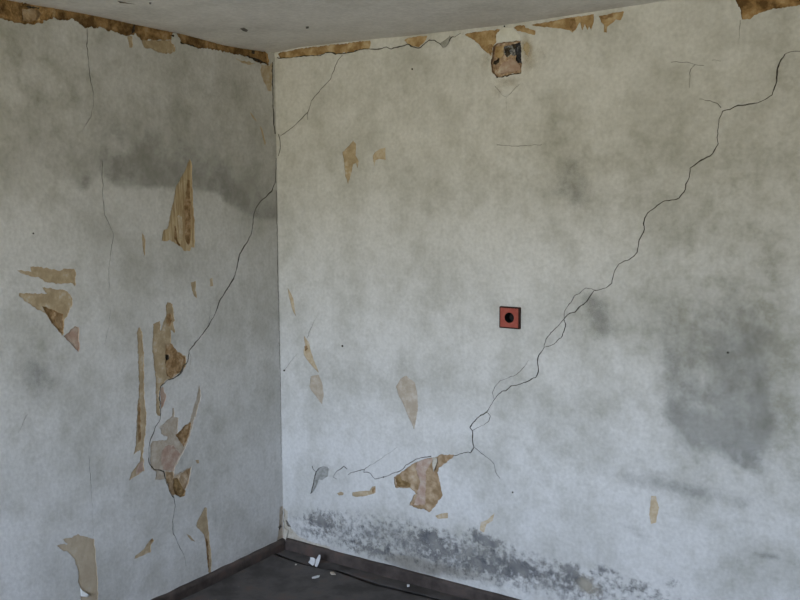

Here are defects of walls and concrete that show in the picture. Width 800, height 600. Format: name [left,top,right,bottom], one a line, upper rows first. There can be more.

spalling [0,0,272,91]
spalling [278,41,371,58]
peeling [465,29,500,56]
peeling [514,11,624,35]
peeling [162,160,195,251]
peeling [17,266,80,352]
crack [148,34,459,564]
crack [454,51,800,478]
peeling [129,302,201,497]
spalling [394,454,454,519]
peeling [57,534,99,600]
leakage [306,513,602,600]